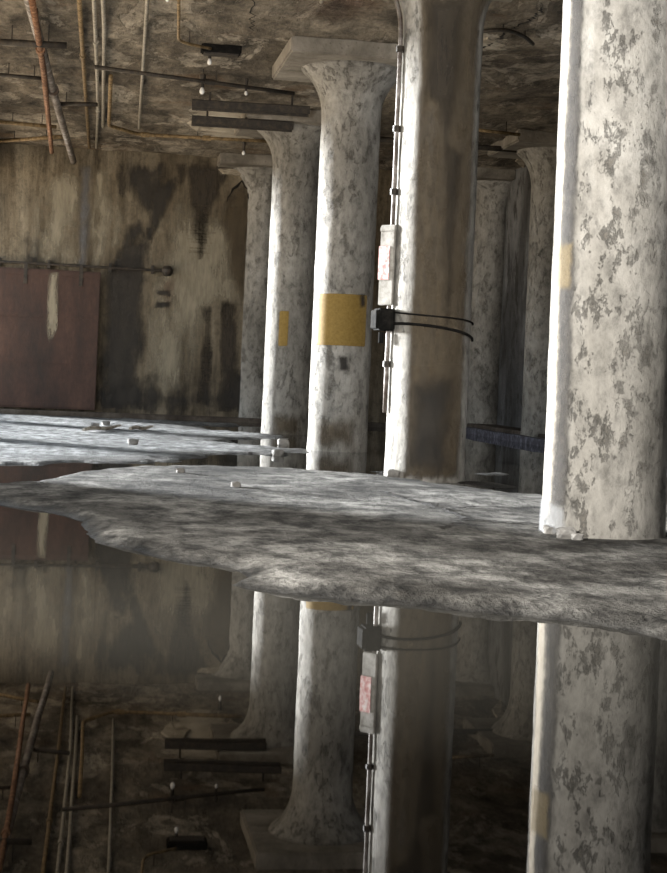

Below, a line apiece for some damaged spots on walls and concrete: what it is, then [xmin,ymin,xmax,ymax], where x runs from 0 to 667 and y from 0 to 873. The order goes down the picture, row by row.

leakage [27,164,248,414]